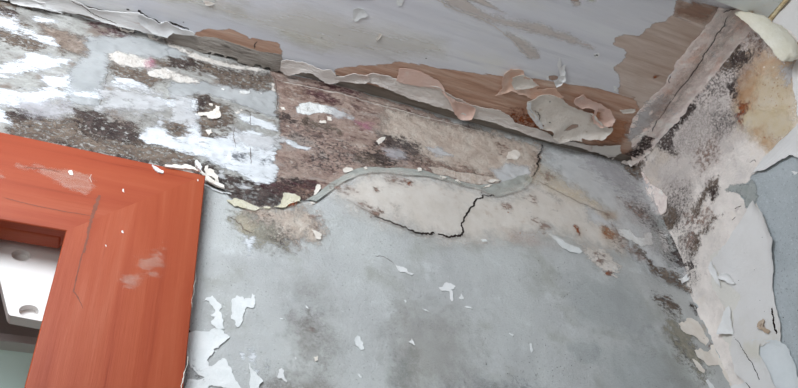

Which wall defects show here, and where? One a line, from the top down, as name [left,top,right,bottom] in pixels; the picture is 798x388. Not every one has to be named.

water stain [0,0,426,250]
spalling [0,0,753,211]
crack [355,192,494,238]
water stain [544,33,794,293]
crack [648,9,735,149]
peeling [184,294,268,388]
water stain [654,295,706,385]
peeling [679,318,732,388]